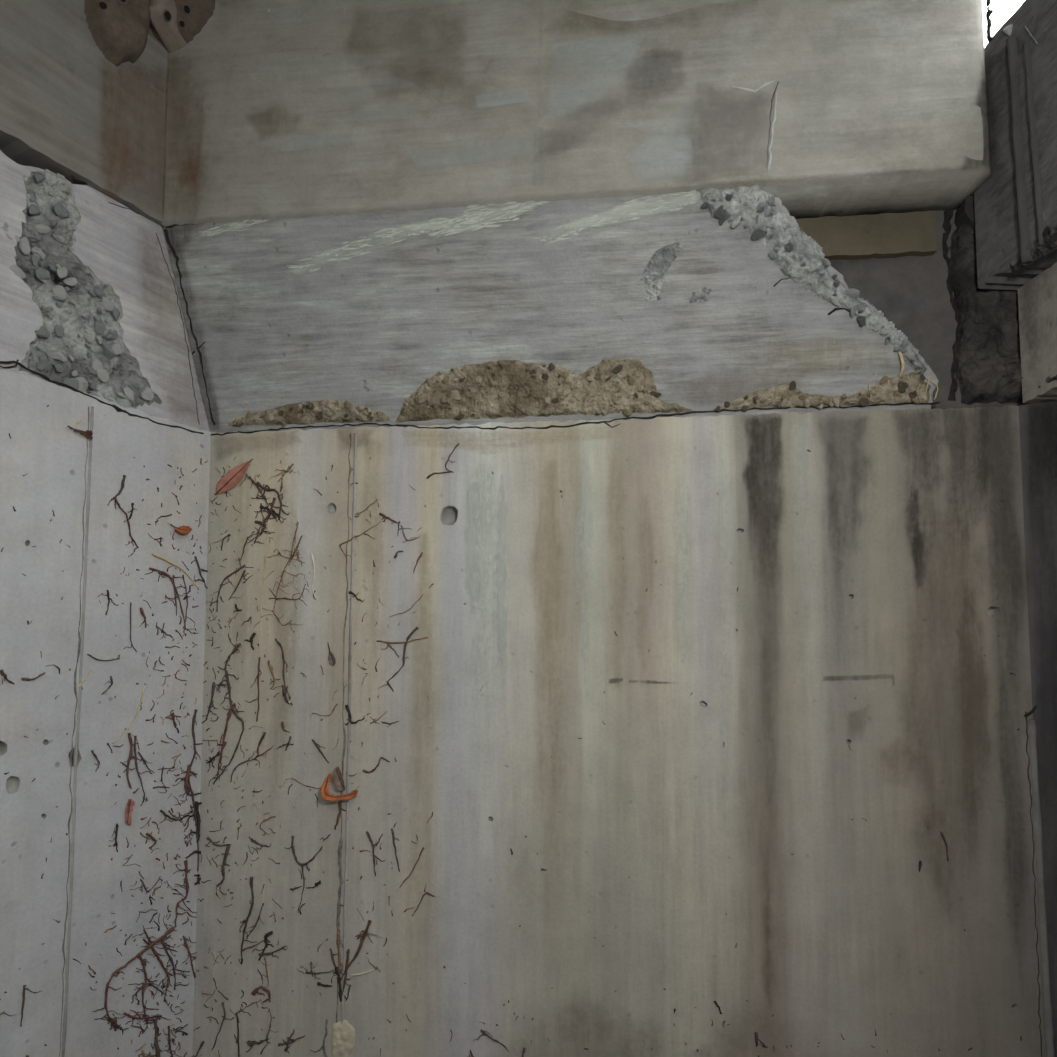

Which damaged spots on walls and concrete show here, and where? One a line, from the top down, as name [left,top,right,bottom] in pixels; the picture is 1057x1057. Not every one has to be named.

crack [766,81,779,167]
spalling [0,169,162,409]
peeling [641,242,683,302]
spalling [696,185,933,412]
spalling [1014,225,1057,271]
water stain [746,418,780,531]